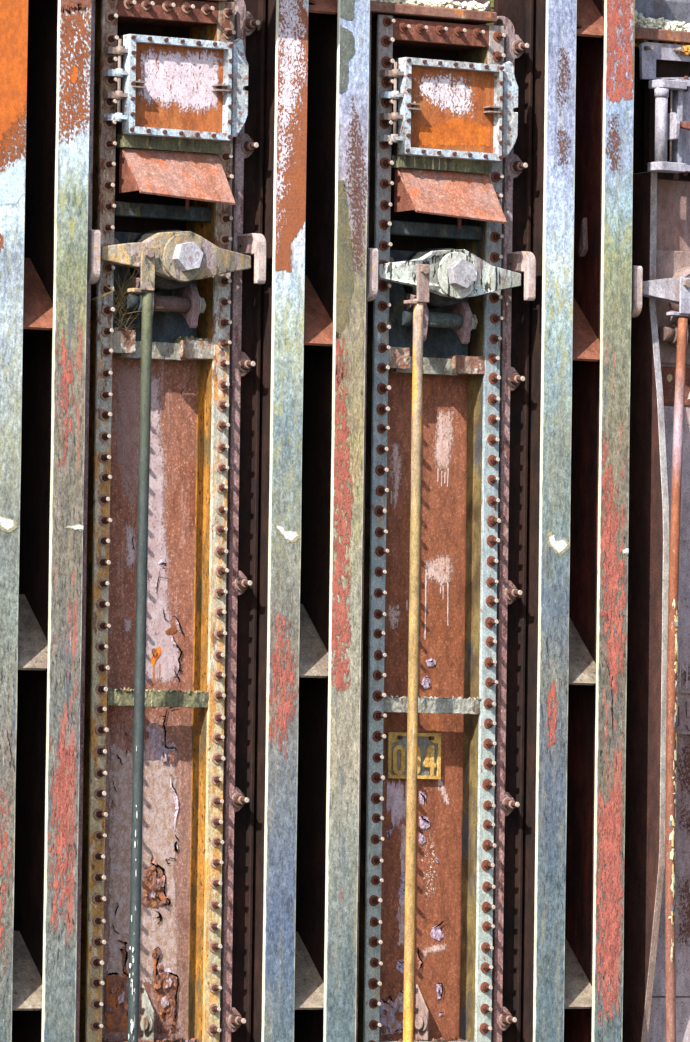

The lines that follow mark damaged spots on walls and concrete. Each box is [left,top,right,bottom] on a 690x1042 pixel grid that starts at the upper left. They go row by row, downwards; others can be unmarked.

corrosion [0,0,28,172]
corrosion [419,116,493,149]
peeling [600,434,629,693]
peeling [269,603,298,758]
spalling [418,791,430,845]
spalling [429,920,445,940]
spalling [436,980,444,1017]